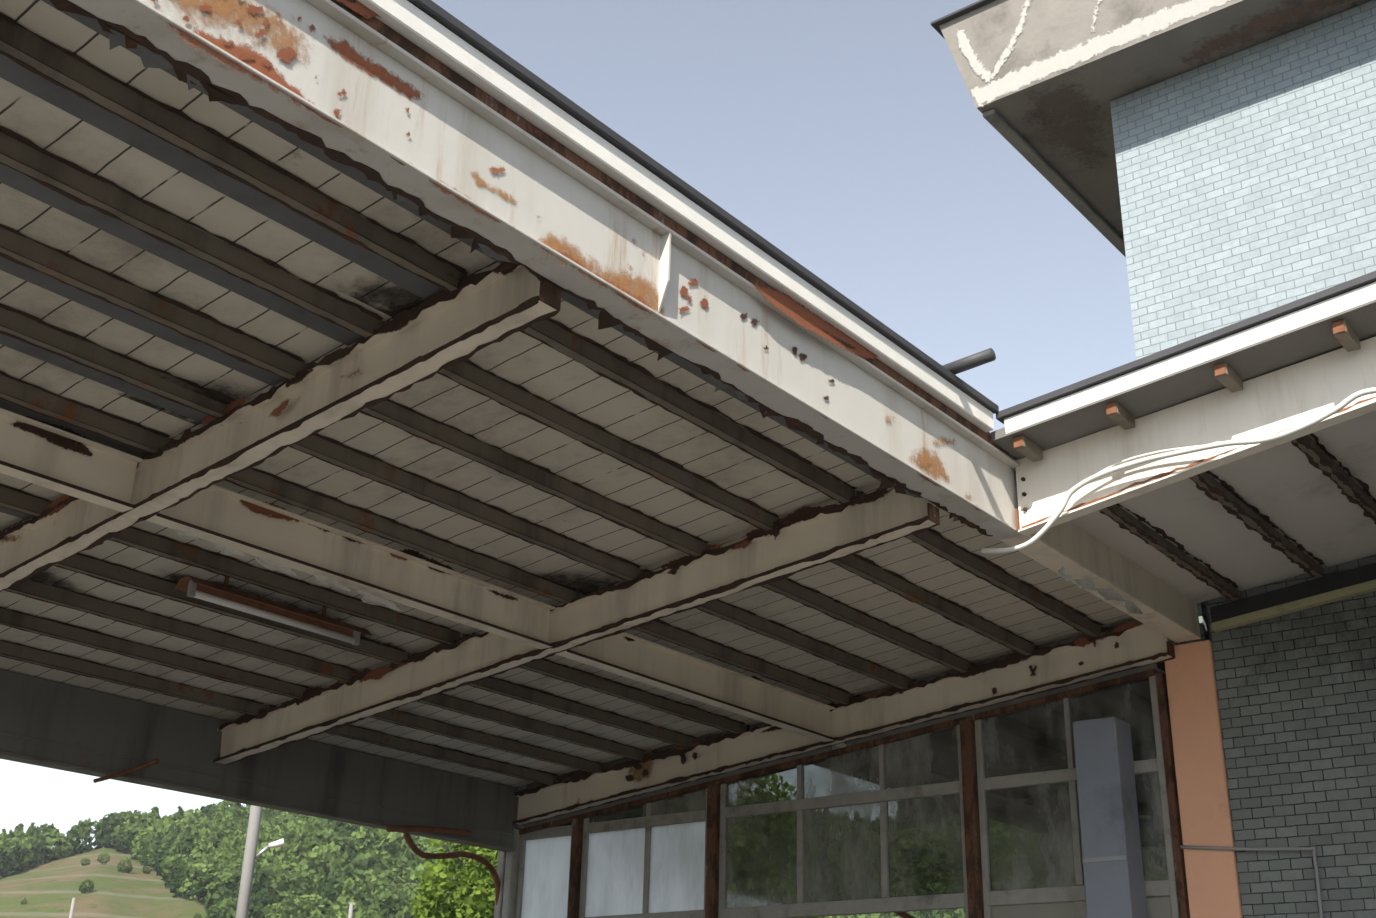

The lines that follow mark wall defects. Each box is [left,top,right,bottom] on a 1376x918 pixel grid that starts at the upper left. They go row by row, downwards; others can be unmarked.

peeling [50,0,240,105]
peeling [386,188,511,262]
peeling [587,303,673,361]
corrosion [0,0,1168,825]
peeling [701,369,839,452]
peeling [854,460,922,498]